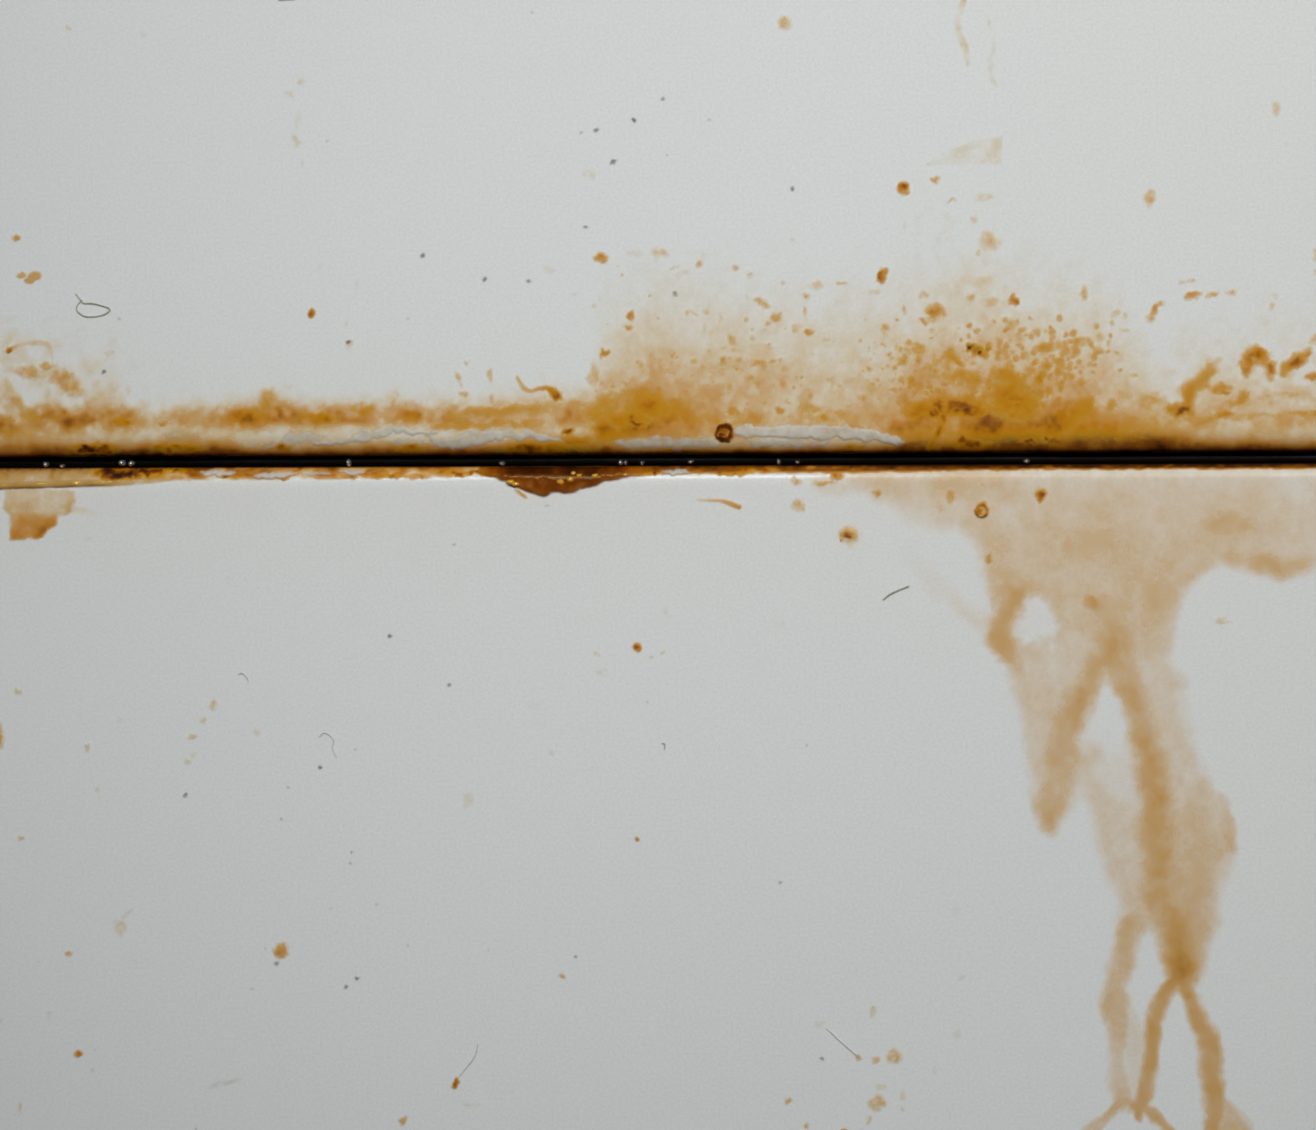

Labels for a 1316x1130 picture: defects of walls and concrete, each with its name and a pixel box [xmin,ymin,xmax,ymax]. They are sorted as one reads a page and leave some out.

rust [18,272,40,283]
rust [877,268,888,283]
rust [921,304,944,325]
rust [0,315,1316,498]
rust [974,501,989,518]
rust [10,509,57,540]